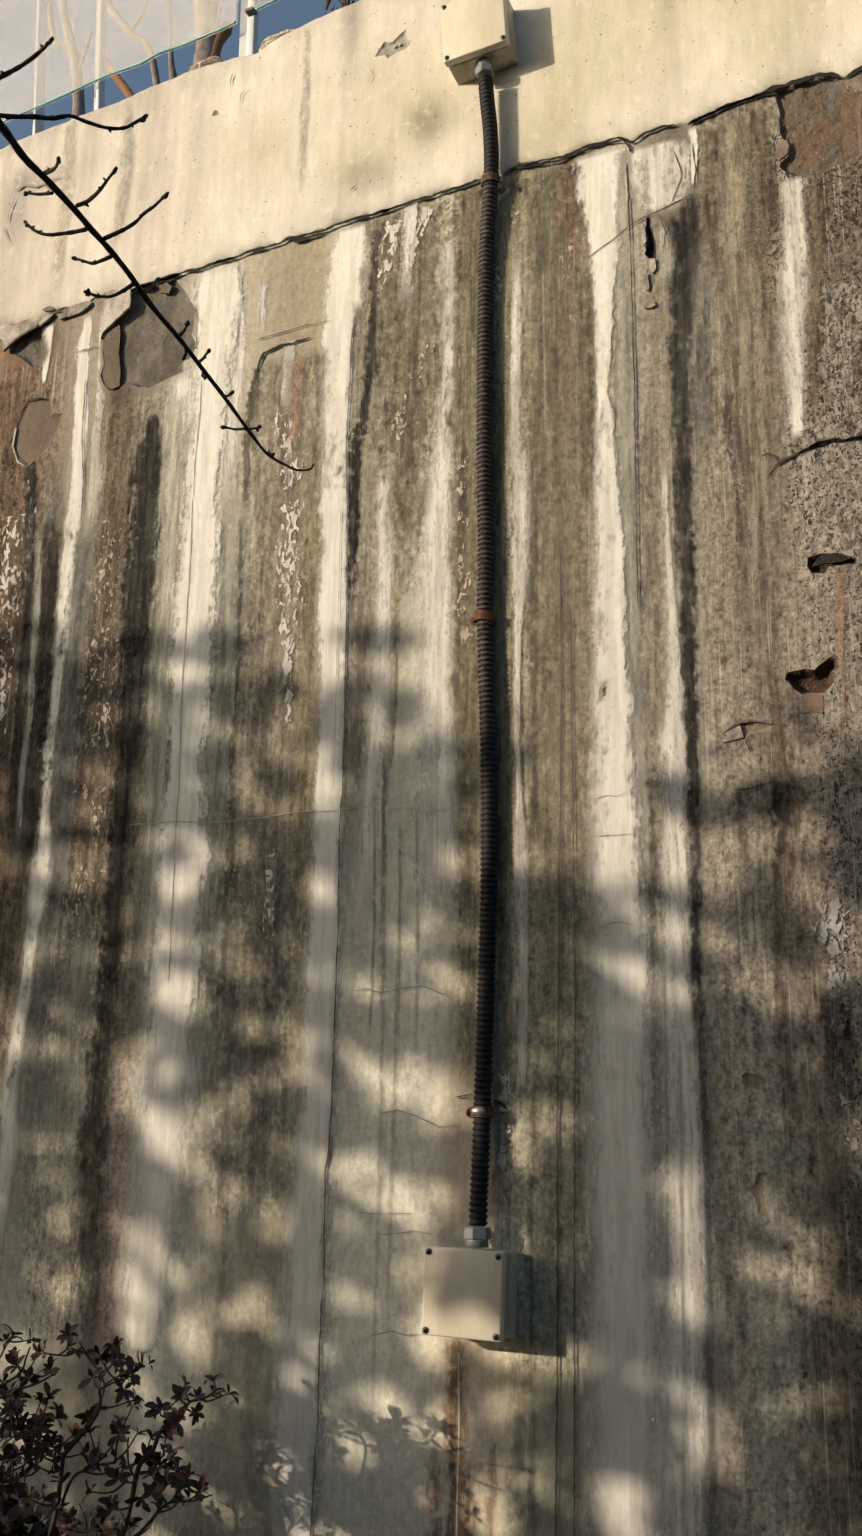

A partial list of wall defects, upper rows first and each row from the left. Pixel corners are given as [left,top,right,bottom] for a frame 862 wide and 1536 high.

spalling [774,76,862,176]
spalling [0,278,198,391]
crack [58,66,862,602]
spalling [12,399,63,468]
spalling [807,553,857,573]
spalling [785,584,862,714]
peeling [722,719,775,743]
damp [0,192,479,1536]
crack [129,316,455,1536]
damp [491,110,825,1536]
corrosion [429,1342,495,1536]